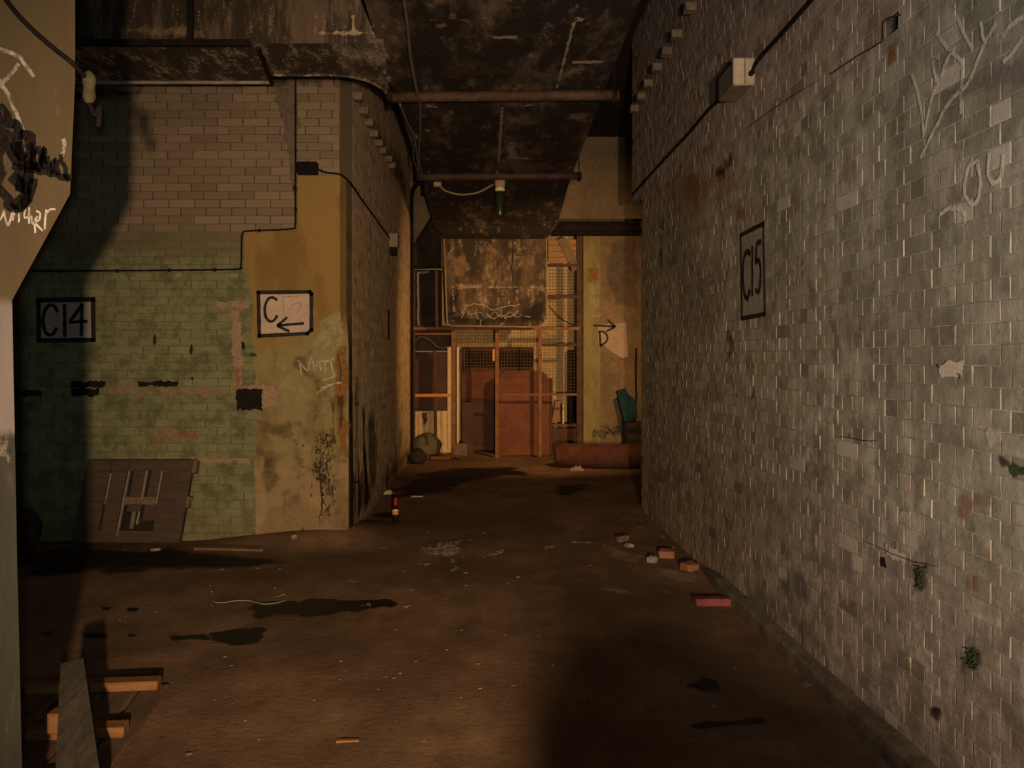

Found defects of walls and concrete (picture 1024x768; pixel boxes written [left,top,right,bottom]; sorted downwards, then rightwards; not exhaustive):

peeling [158,300,279,408]
rust [332,346,348,451]
spalling [938,360,964,379]
damp [303,429,336,521]
crack [865,541,937,567]